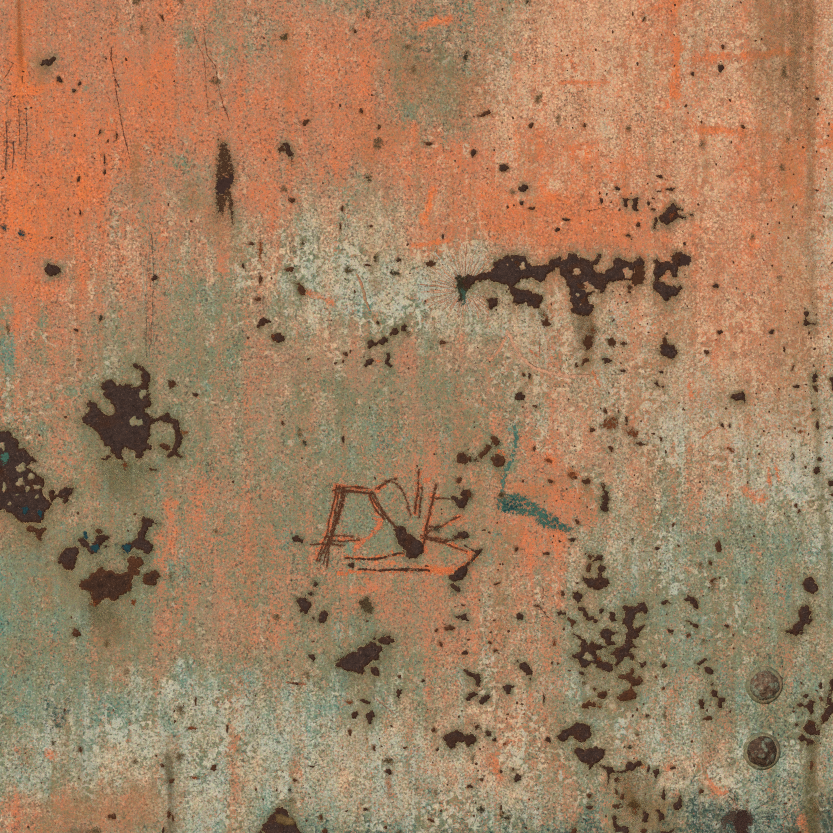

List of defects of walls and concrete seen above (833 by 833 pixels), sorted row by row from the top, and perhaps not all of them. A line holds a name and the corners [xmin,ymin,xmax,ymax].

rust [215,138,234,223]
rust [462,166,700,394]
rust [716,796,801,833]